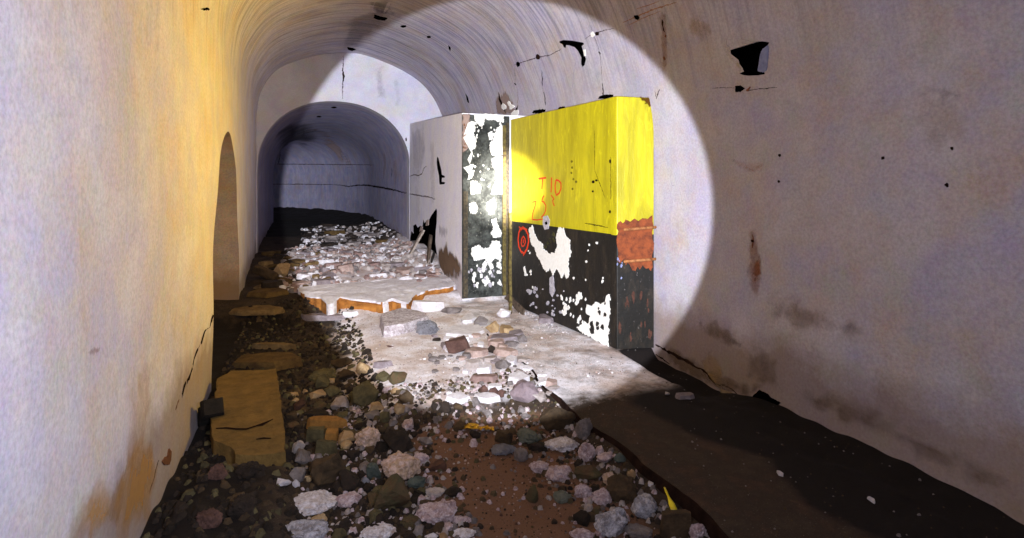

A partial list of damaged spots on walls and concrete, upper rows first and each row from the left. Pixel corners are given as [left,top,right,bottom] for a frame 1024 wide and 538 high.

spalling [559,40,586,65]
spalling [730,40,769,92]
crack [175,315,214,410]
crack [655,344,737,394]
crack [513,355,729,538]